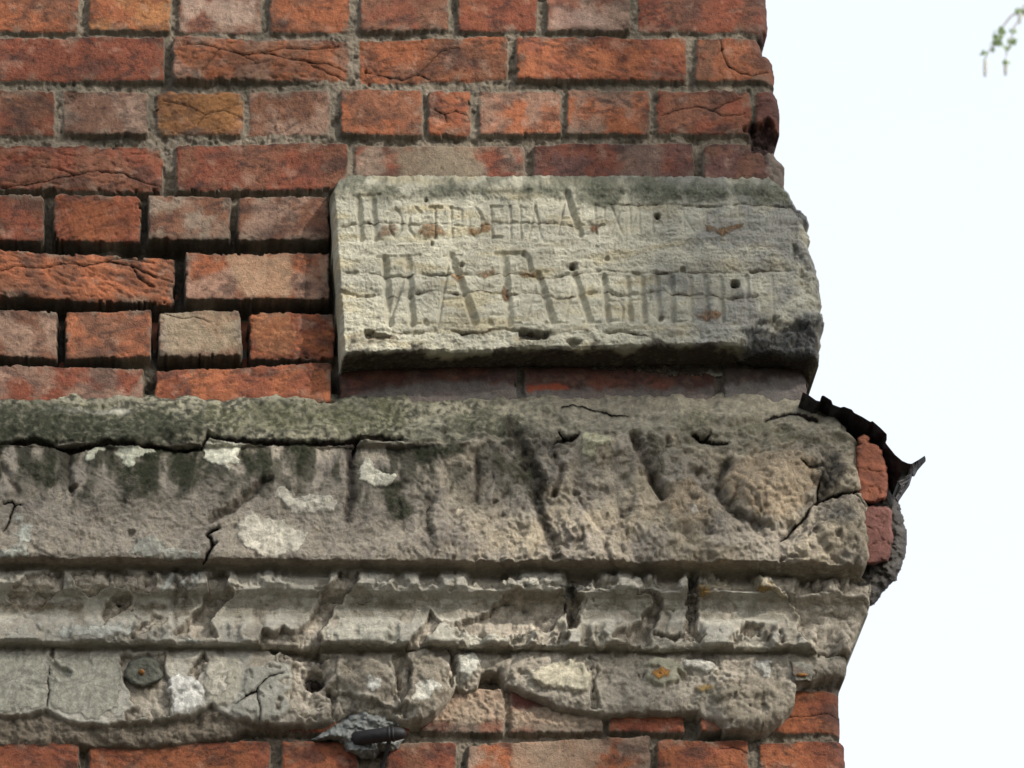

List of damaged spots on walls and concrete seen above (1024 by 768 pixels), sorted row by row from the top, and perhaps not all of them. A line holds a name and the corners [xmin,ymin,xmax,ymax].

crack [661,39,767,116]
spalling [747,124,776,156]
crack [554,404,628,445]
crack [766,413,818,423]
crack [3,500,22,532]
damp [346,445,357,523]
crack [780,460,864,542]
crack [202,528,219,565]
spalling [9,534,233,645]
spalling [260,432,894,723]
crack [236,673,282,720]